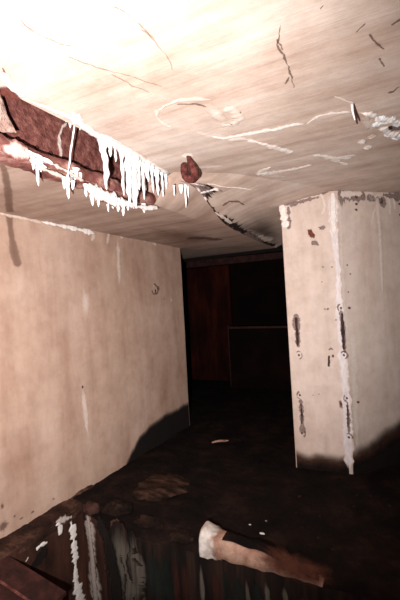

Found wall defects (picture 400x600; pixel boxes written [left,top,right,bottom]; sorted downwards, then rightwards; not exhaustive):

crack [277,29,294,85]
water stain [357,111,400,150]
water stain [0,122,146,216]
spalling [284,192,327,206]
spalling [338,190,400,207]
water stain [320,192,360,470]
water stain [55,513,149,600]